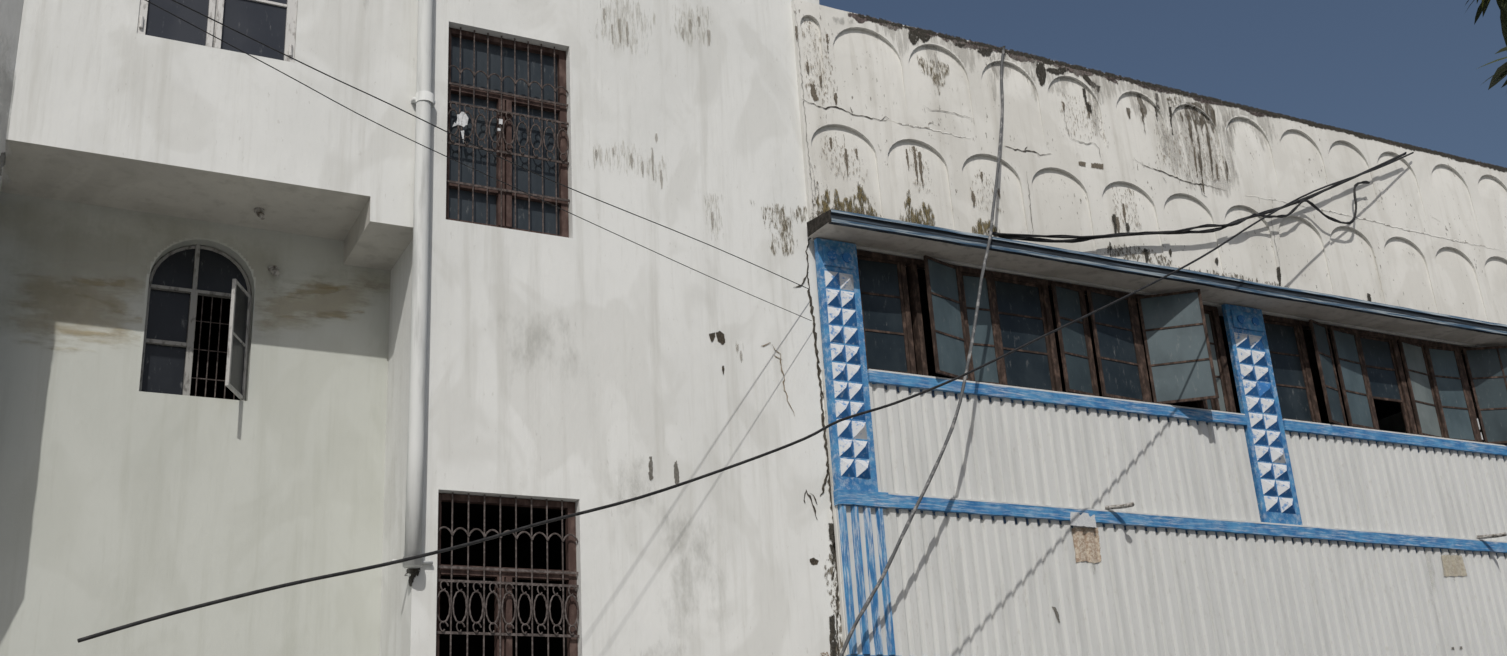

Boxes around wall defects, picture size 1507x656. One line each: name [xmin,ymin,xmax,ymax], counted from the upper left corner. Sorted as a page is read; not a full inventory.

water stain [848,12,1507,195]
water stain [810,165,882,219]
water stain [906,190,928,225]
water stain [1108,214,1130,256]